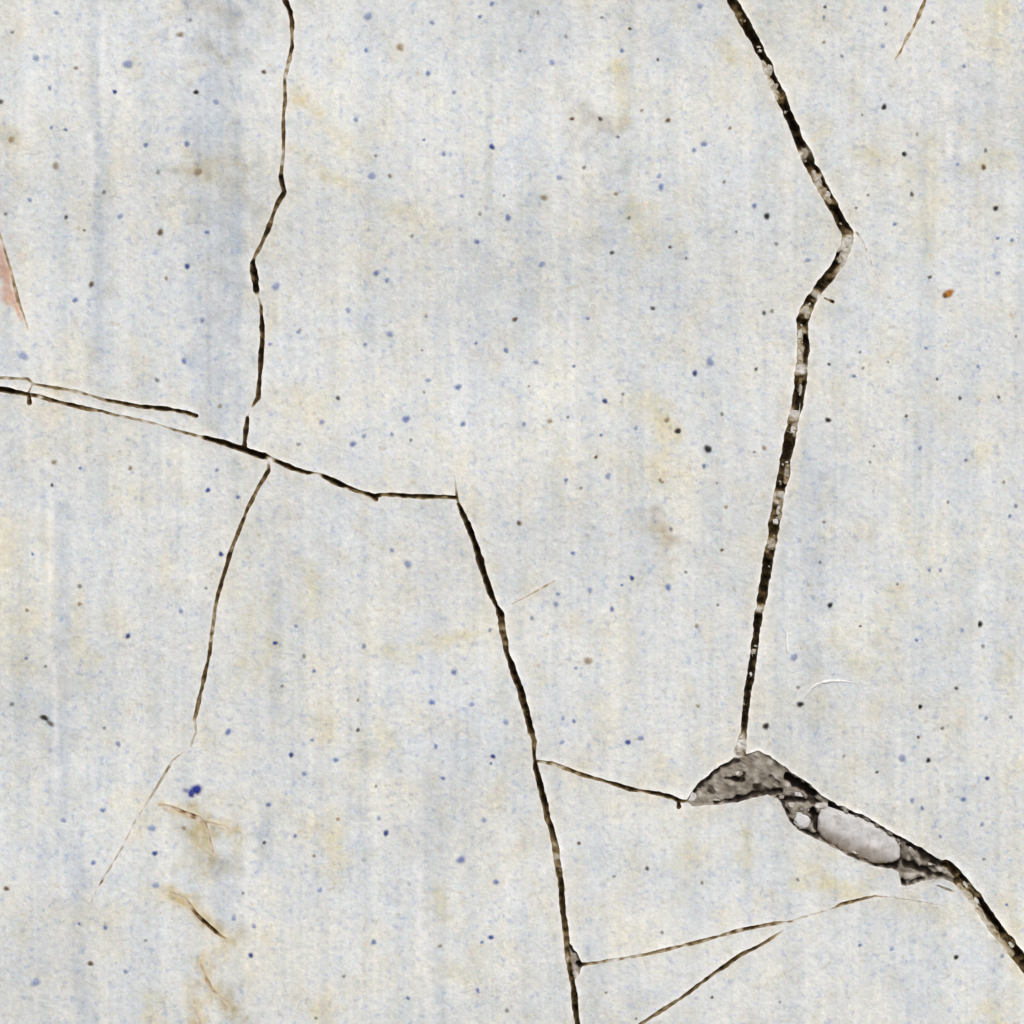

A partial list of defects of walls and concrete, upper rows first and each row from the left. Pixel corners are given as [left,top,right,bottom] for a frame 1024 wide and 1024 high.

crack [895,0,927,60]
crack [727,0,880,760]
crack [0,0,459,907]
crack [457,502,944,1024]
flaking render [686,750,956,893]
crack [169,891,229,940]
crack [941,859,1024,973]
crack [193,963,231,1024]